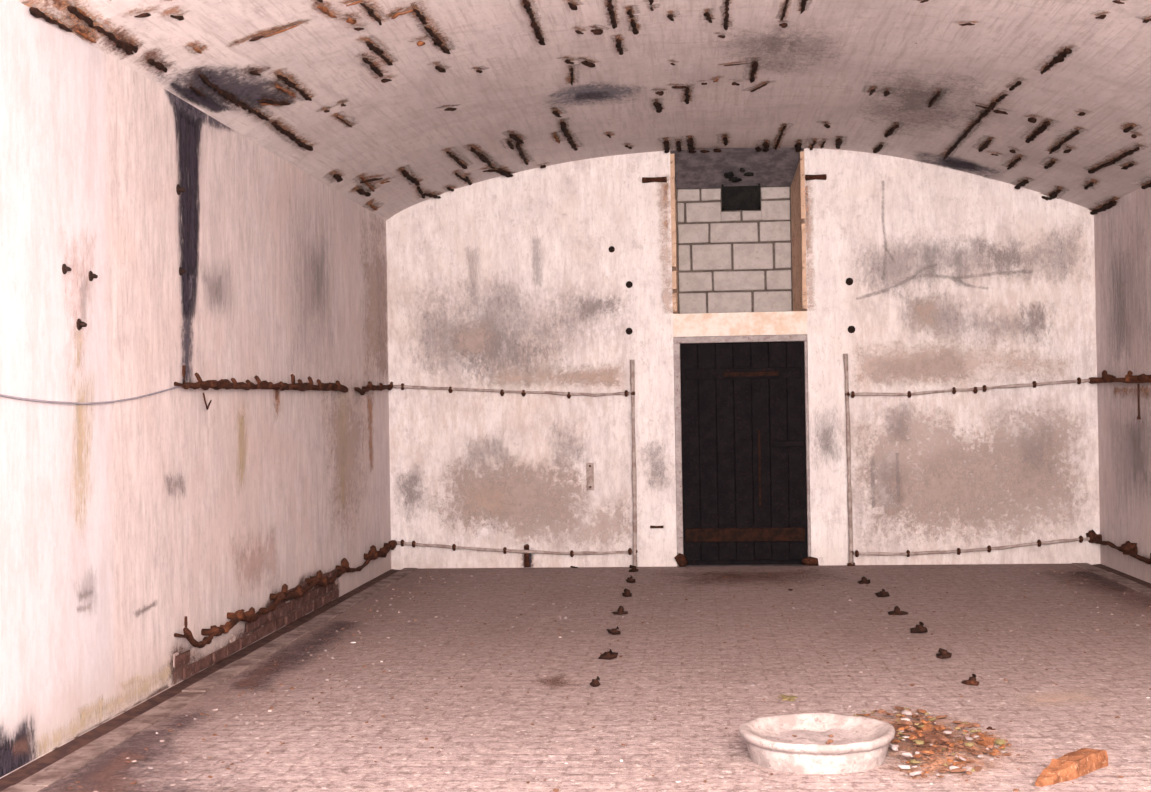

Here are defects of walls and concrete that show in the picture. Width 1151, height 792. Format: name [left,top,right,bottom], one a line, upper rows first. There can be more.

spalling [22,0,175,74]
spalling [231,20,307,46]
spalling [313,0,453,83]
spalling [521,0,546,45]
spalling [574,0,680,55]
spalling [185,41,357,151]
spalling [653,58,773,113]
spalling [941,78,1086,189]
spalling [1084,123,1142,190]
water stain [166,90,231,383]
water stain [438,459,629,543]
water stain [856,410,1083,540]